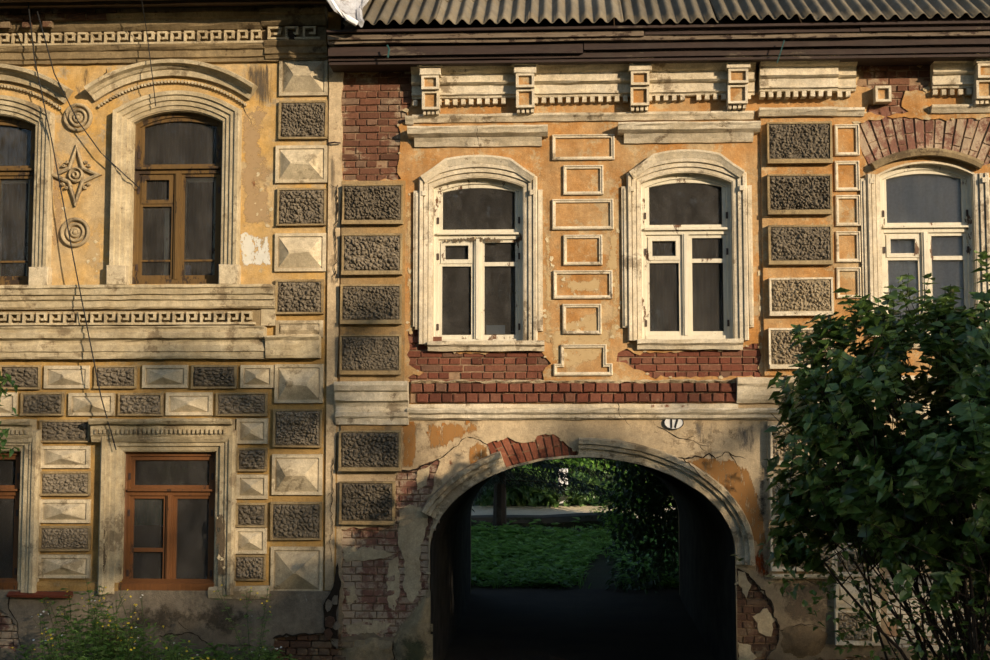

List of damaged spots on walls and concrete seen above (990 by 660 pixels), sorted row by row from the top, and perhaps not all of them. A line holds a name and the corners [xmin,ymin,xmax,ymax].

flaking render [852,66,990,166]
flaking render [405,193,764,403]
flaking render [272,420,576,660]
crack [401,437,491,481]
crack [657,426,746,513]
peeling [688,458,766,553]
flaking render [0,611,19,652]
flaking render [734,566,779,660]
flaking render [815,571,981,660]